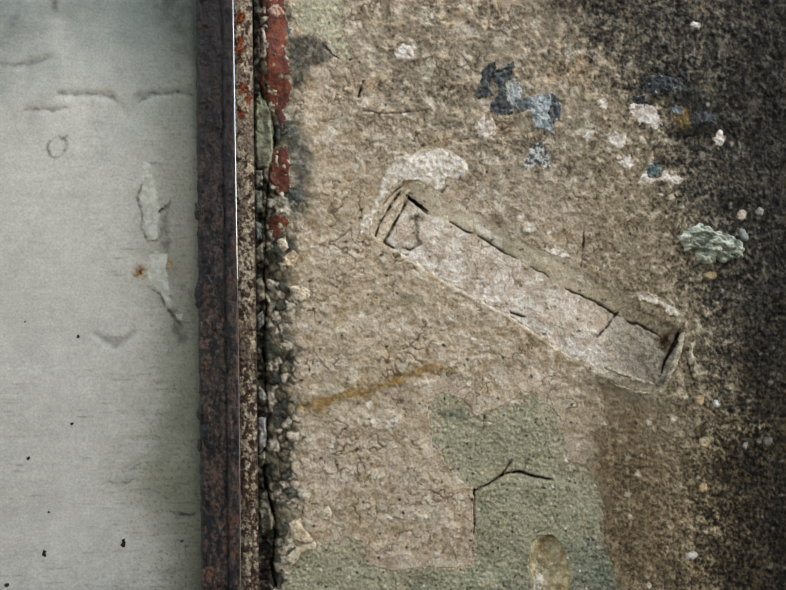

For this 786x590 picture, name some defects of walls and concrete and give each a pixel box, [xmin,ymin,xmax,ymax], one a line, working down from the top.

rust [237,83,252,118]
peeling [259,0,360,130]
peeling [474,61,561,135]
water stain [635,68,736,139]
peeling [137,162,171,242]
peeling [269,145,291,195]
peeling [524,141,554,171]
peeling [265,213,299,268]
peeling [147,244,185,338]
rust [299,364,448,411]
flaking render [277,390,622,590]
crack [473,460,551,530]